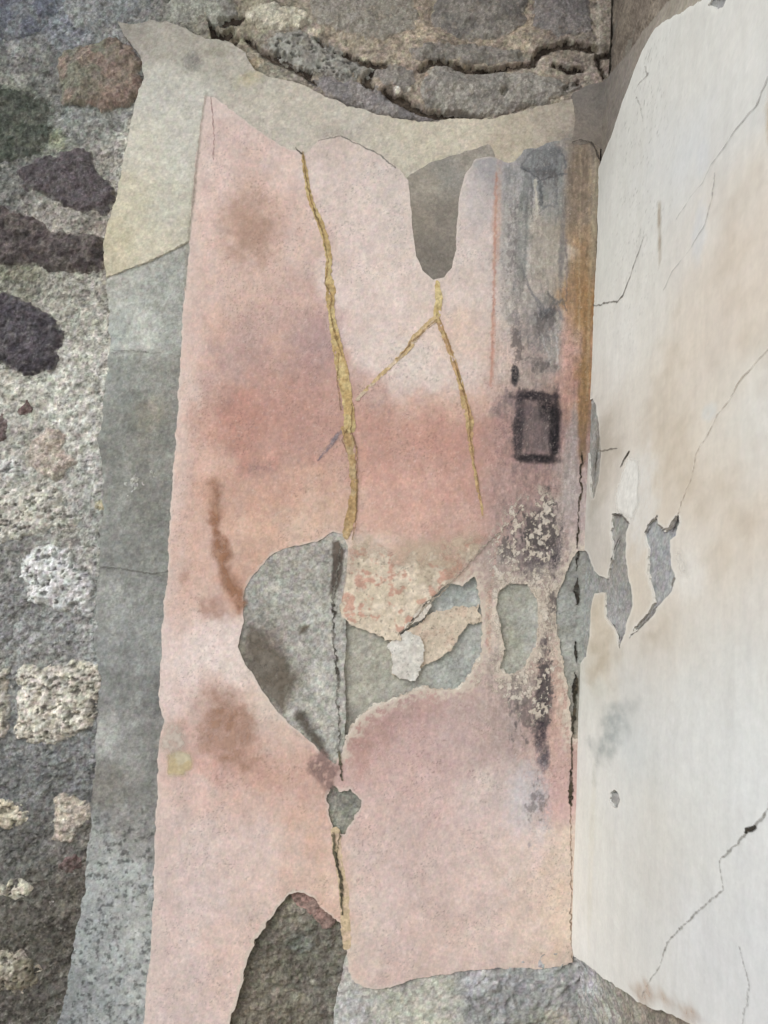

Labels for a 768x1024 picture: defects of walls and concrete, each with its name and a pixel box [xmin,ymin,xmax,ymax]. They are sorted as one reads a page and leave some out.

crack [712,79,767,189]
peeling [407,144,495,280]
crack [296,136,505,781]
crack [573,453,583,605]
spalling [238,459,680,764]
crack [330,827,352,950]
crack [568,641,578,958]
crack [719,812,765,862]
spalling [230,892,347,1024]